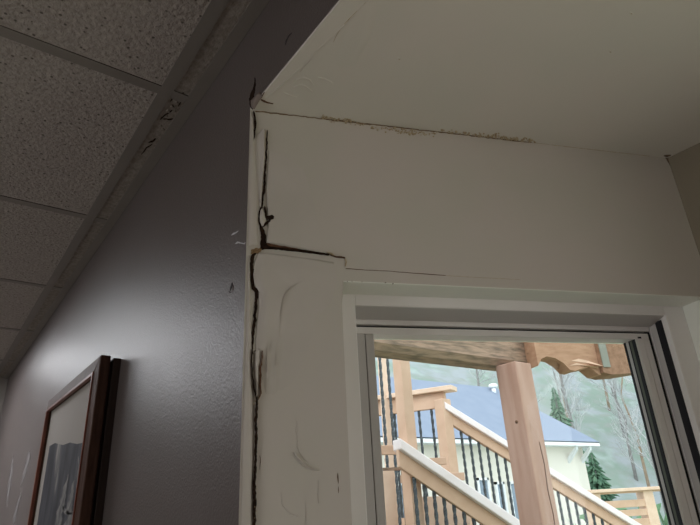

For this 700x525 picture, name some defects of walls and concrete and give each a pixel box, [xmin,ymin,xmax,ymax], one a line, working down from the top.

crack [249,78,646,525]